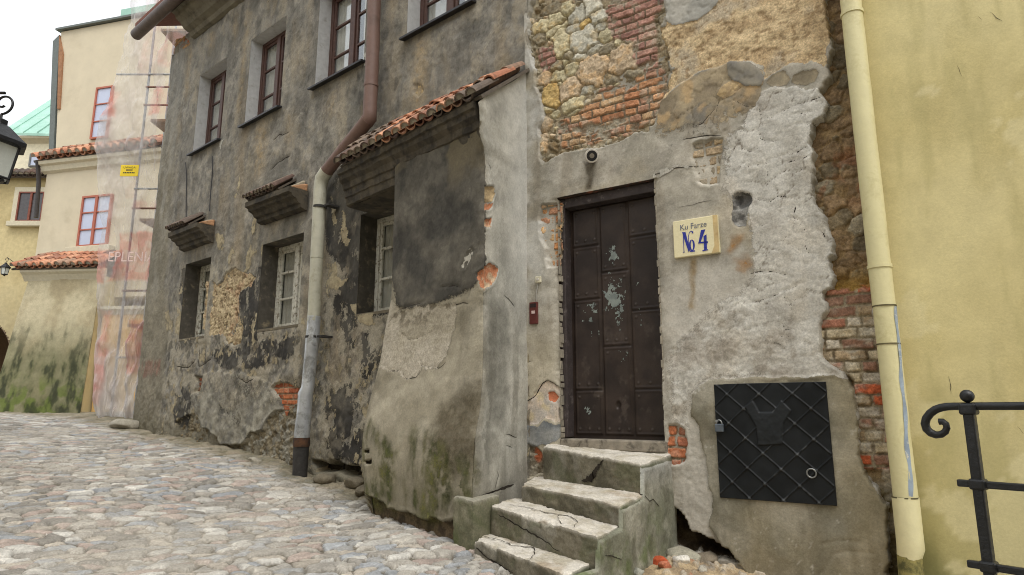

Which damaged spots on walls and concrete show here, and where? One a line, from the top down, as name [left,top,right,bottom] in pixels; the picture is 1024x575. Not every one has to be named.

peeling [330,197,351,246]
crack [683,97,826,253]
flaking render [160,217,305,445]
peeling [313,262,457,431]
spalling [477,263,498,291]
flaking render [527,0,898,575]
flaking render [239,378,300,465]
crack [582,453,611,483]
crack [476,474,578,573]